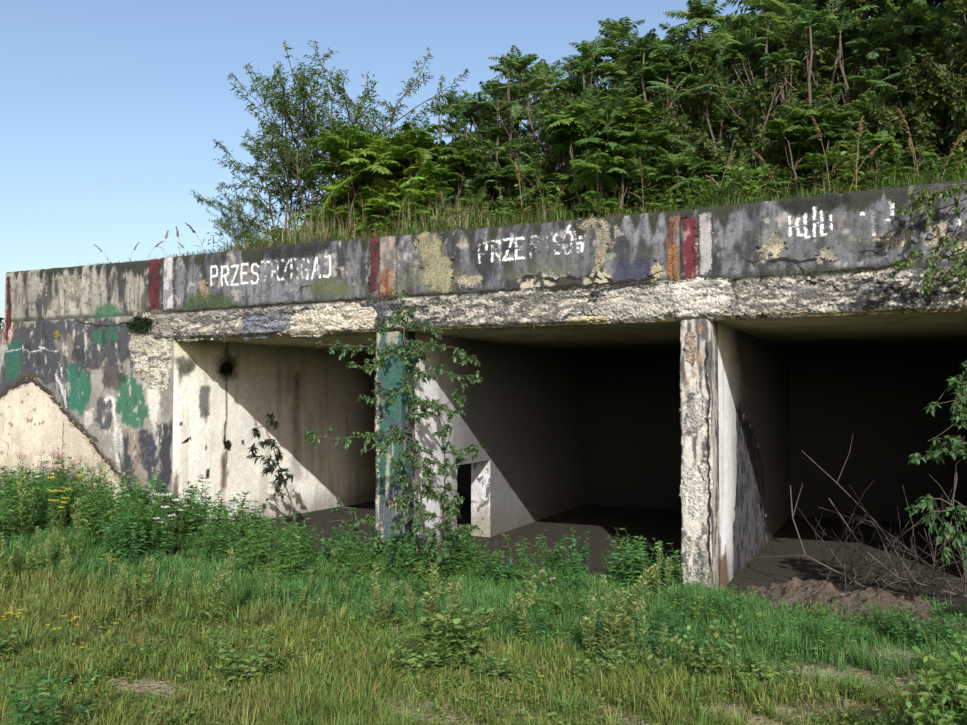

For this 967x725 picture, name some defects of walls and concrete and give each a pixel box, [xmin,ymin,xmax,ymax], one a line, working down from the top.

peeling [368,236,397,295]
spalling [413,212,841,328]
spalling [128,256,378,451]
spalling [679,390,711,440]
crack [697,340,712,570]
spalling [679,458,713,521]
spalling [682,534,712,587]